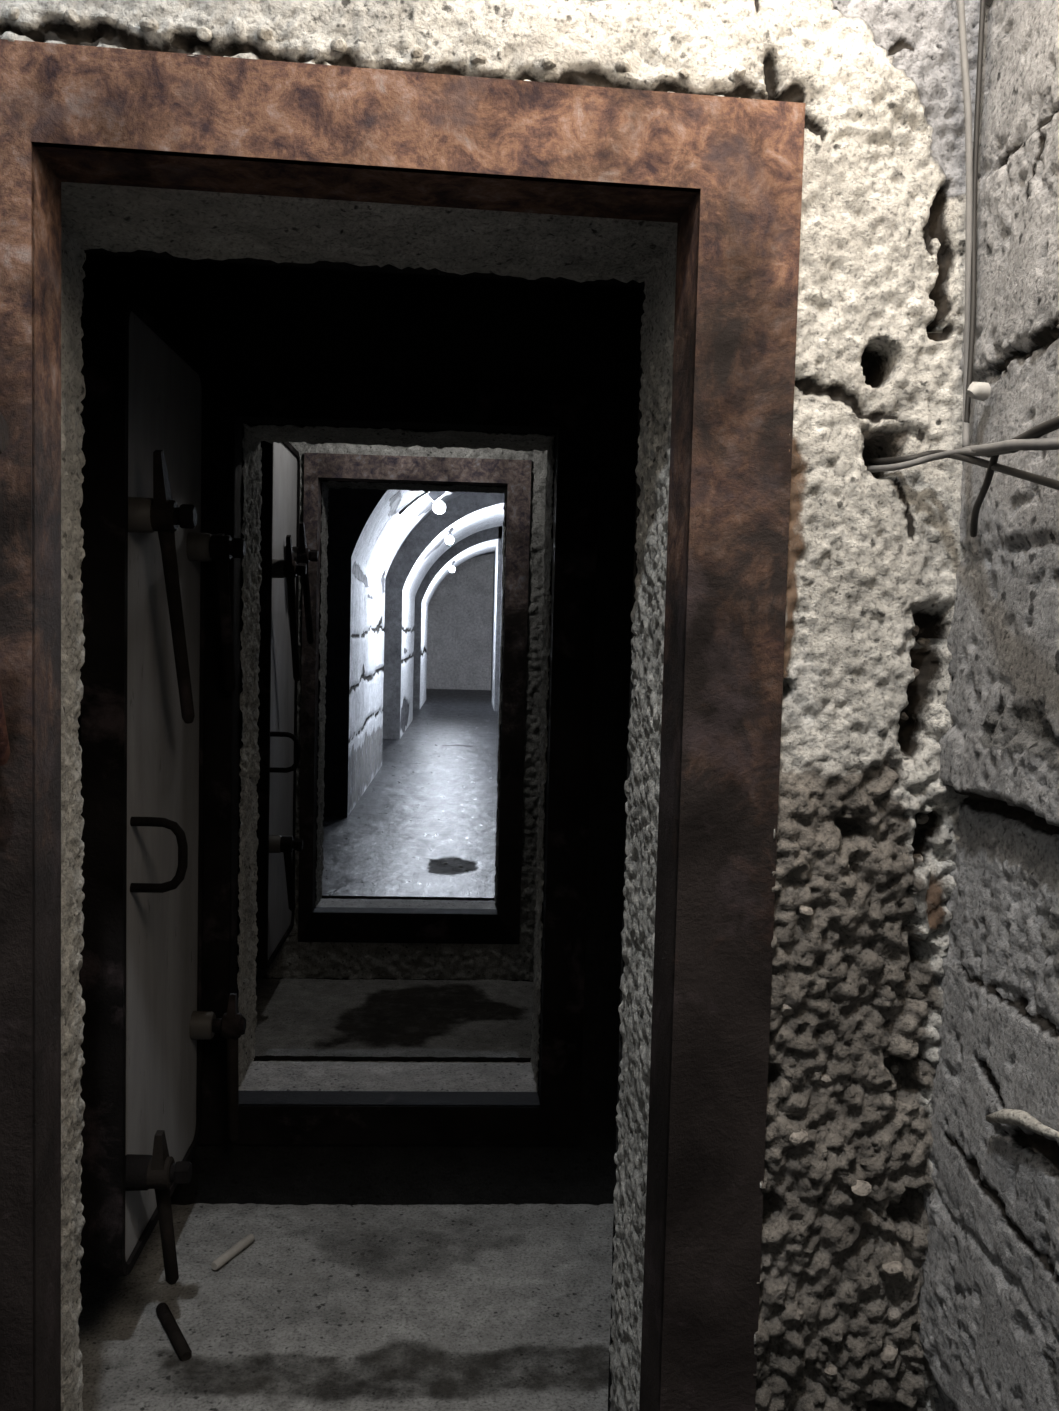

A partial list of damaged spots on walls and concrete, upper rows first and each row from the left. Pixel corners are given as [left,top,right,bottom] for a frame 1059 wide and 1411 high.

spalling [888,38,915,55]
leakage [317,984,523,1047]